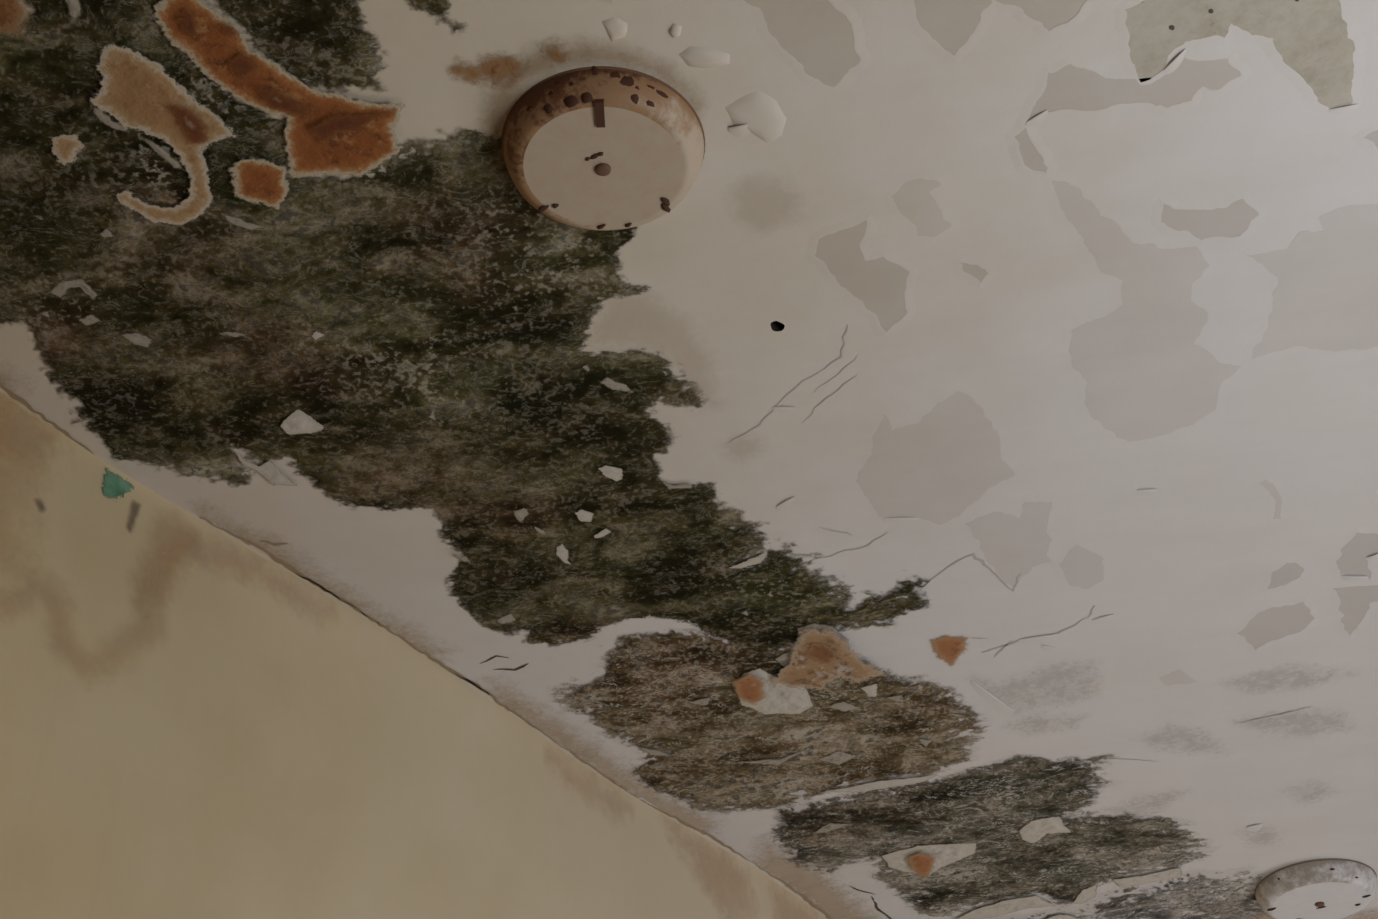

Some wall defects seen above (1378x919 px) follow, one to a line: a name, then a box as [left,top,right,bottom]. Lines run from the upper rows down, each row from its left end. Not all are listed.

corrosion [91,44,236,225]
corrosion [152,0,406,210]
peeling [902,0,1366,129]
damp [0,0,929,652]
crack [729,325,857,443]
corrosion [733,628,884,705]
corrosion [930,636,968,666]
crack [973,606,1095,658]
damp [555,630,1270,919]